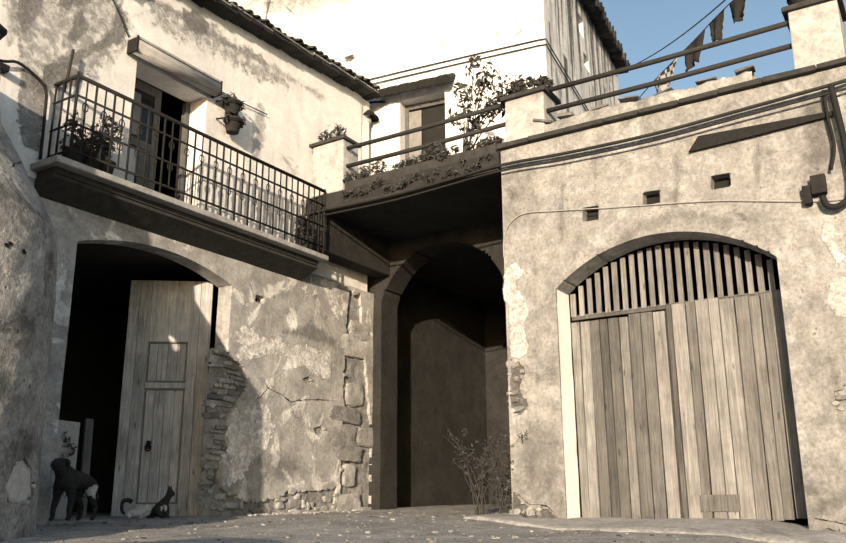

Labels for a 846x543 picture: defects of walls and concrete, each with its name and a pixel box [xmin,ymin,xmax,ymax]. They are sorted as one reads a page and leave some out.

spalling [196,286,373,517]
crack [259,380,335,415]
peeling [503,263,529,415]
spalling [832,385,846,411]